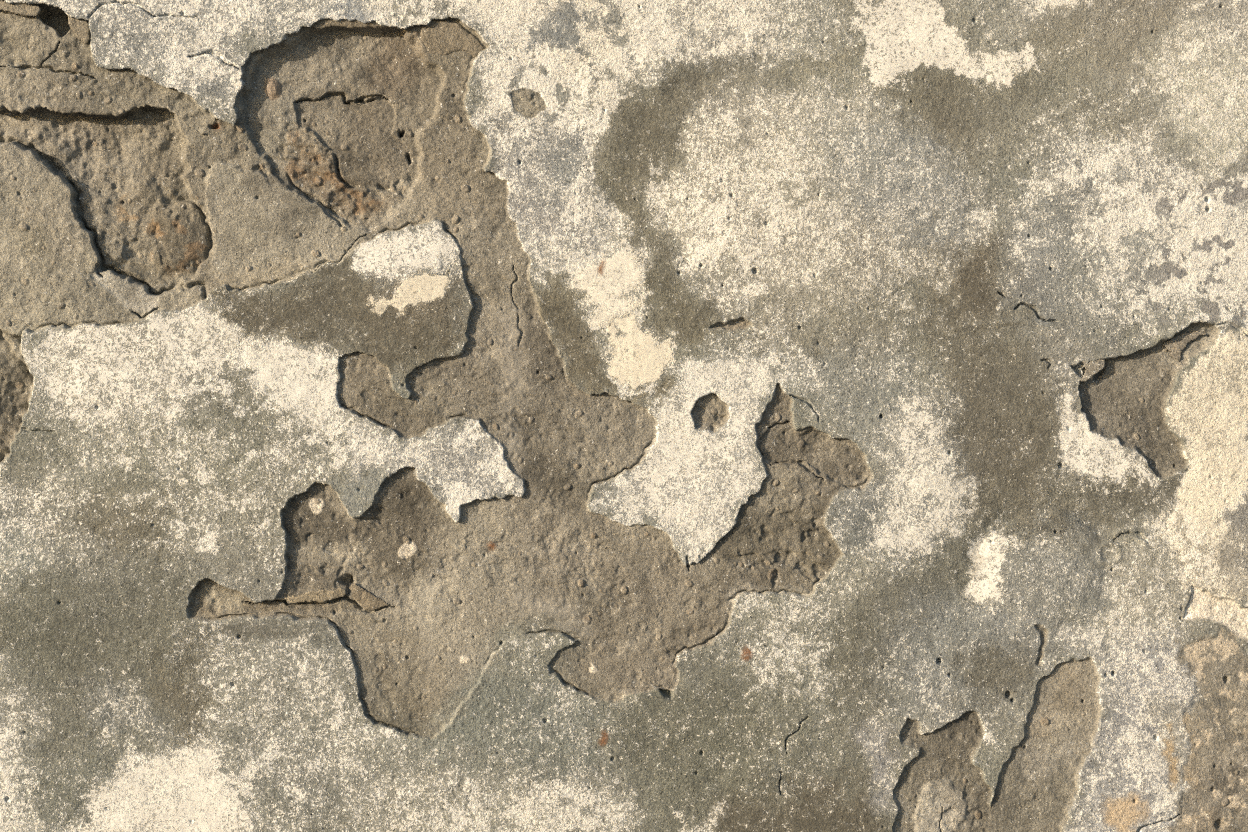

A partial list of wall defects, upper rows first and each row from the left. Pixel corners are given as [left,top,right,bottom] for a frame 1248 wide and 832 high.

crack [293,91,390,105]
flaking render [0,0,1013,741]
flaking render [1056,319,1222,495]
flaking render [892,623,1104,832]
peeling [1179,584,1248,832]